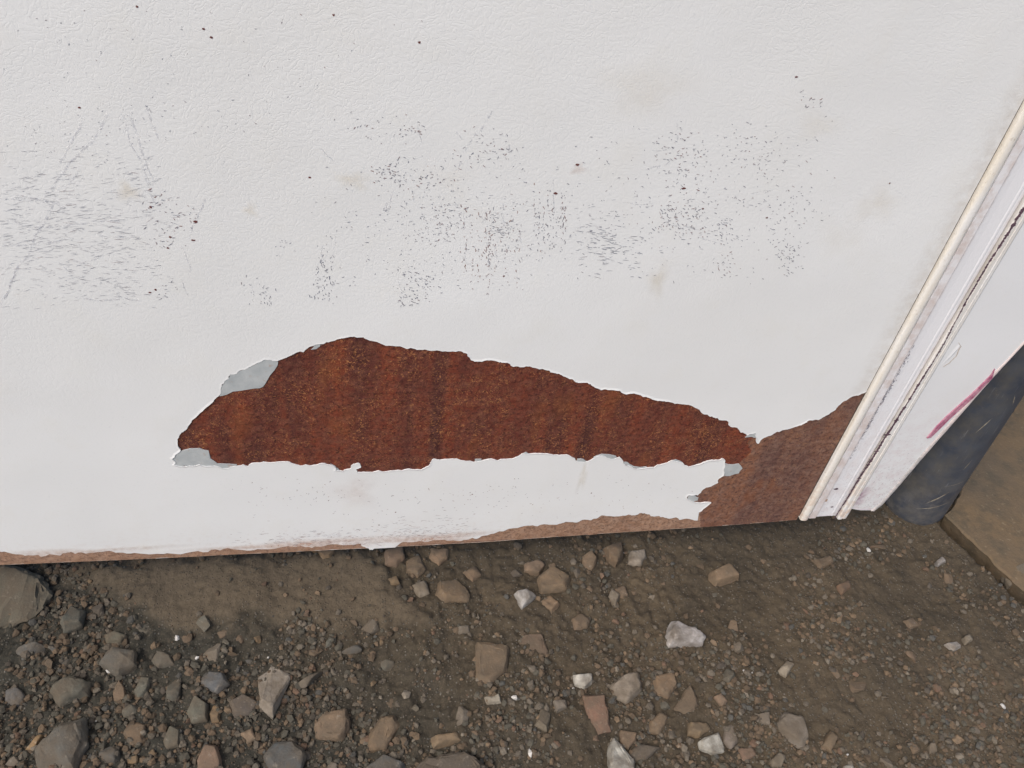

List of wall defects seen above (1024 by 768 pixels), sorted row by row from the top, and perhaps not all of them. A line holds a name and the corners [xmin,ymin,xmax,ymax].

peeling [170,335,867,512]
rust [173,337,864,546]
rust [0,543,364,565]